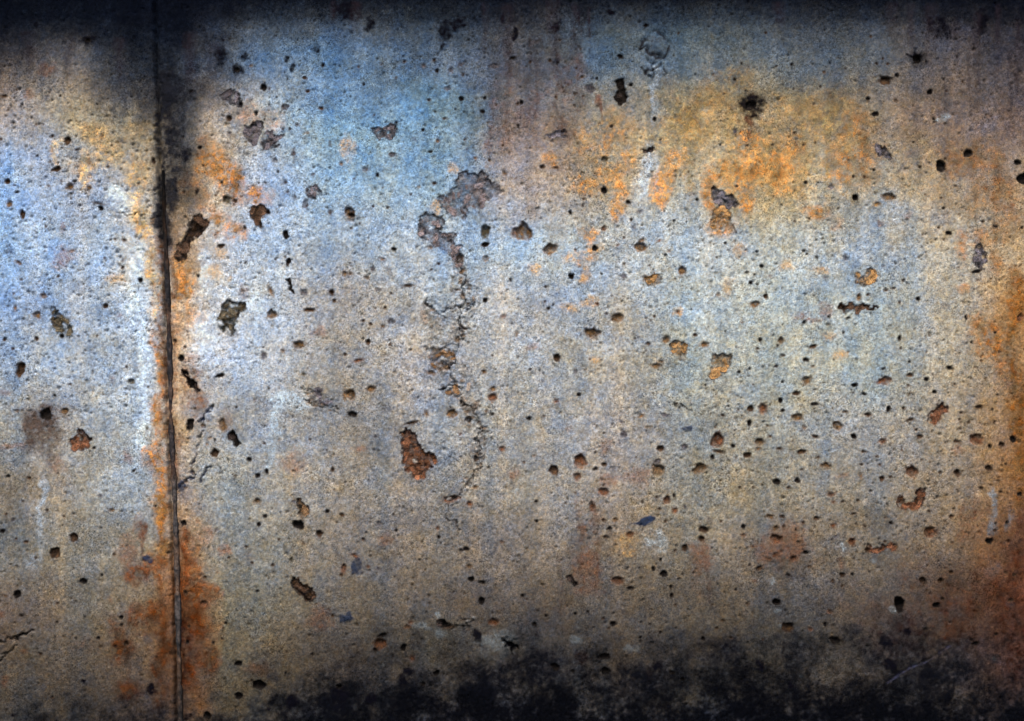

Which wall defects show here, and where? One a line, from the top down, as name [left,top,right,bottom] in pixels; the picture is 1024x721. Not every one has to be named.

rust [128,164,193,303]
spalling [174,214,209,262]
rust [183,146,262,206]
peeling [418,169,506,303]
spalling [710,186,739,234]
rust [702,118,797,213]
spalling [218,300,246,336]
crack [457,268,471,336]
rust [125,325,205,584]
spalling [399,412,437,480]
crack [440,358,489,524]
leakage [196,619,1024,721]